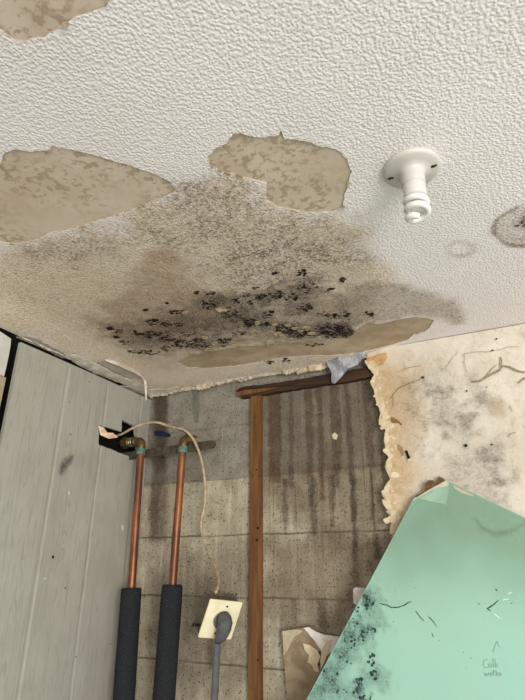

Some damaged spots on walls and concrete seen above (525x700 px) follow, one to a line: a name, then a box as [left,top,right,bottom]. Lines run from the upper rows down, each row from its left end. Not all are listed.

peeling [0,0,109,40]
peeling [0,146,175,245]
peeling [208,131,352,212]
leakage [0,180,460,389]
peeling [18,317,434,534]